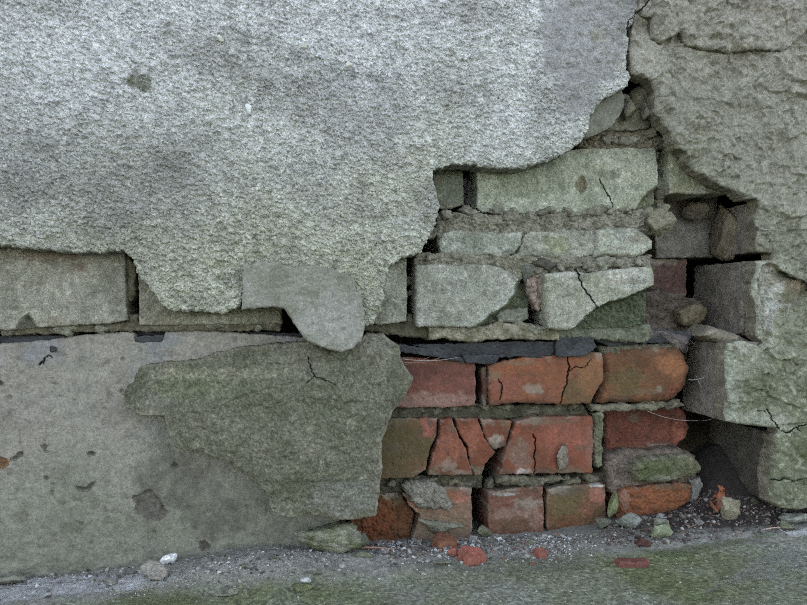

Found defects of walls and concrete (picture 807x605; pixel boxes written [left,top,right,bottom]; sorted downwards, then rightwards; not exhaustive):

crack [626,0,649,35]
spalling [363,13,764,330]
spalling [0,240,243,316]
crack [574,268,597,307]
spalling [15,312,37,329]
crack [560,357,592,404]
crack [757,409,807,433]
spalling [74,480,96,492]
spalling [132,488,169,521]